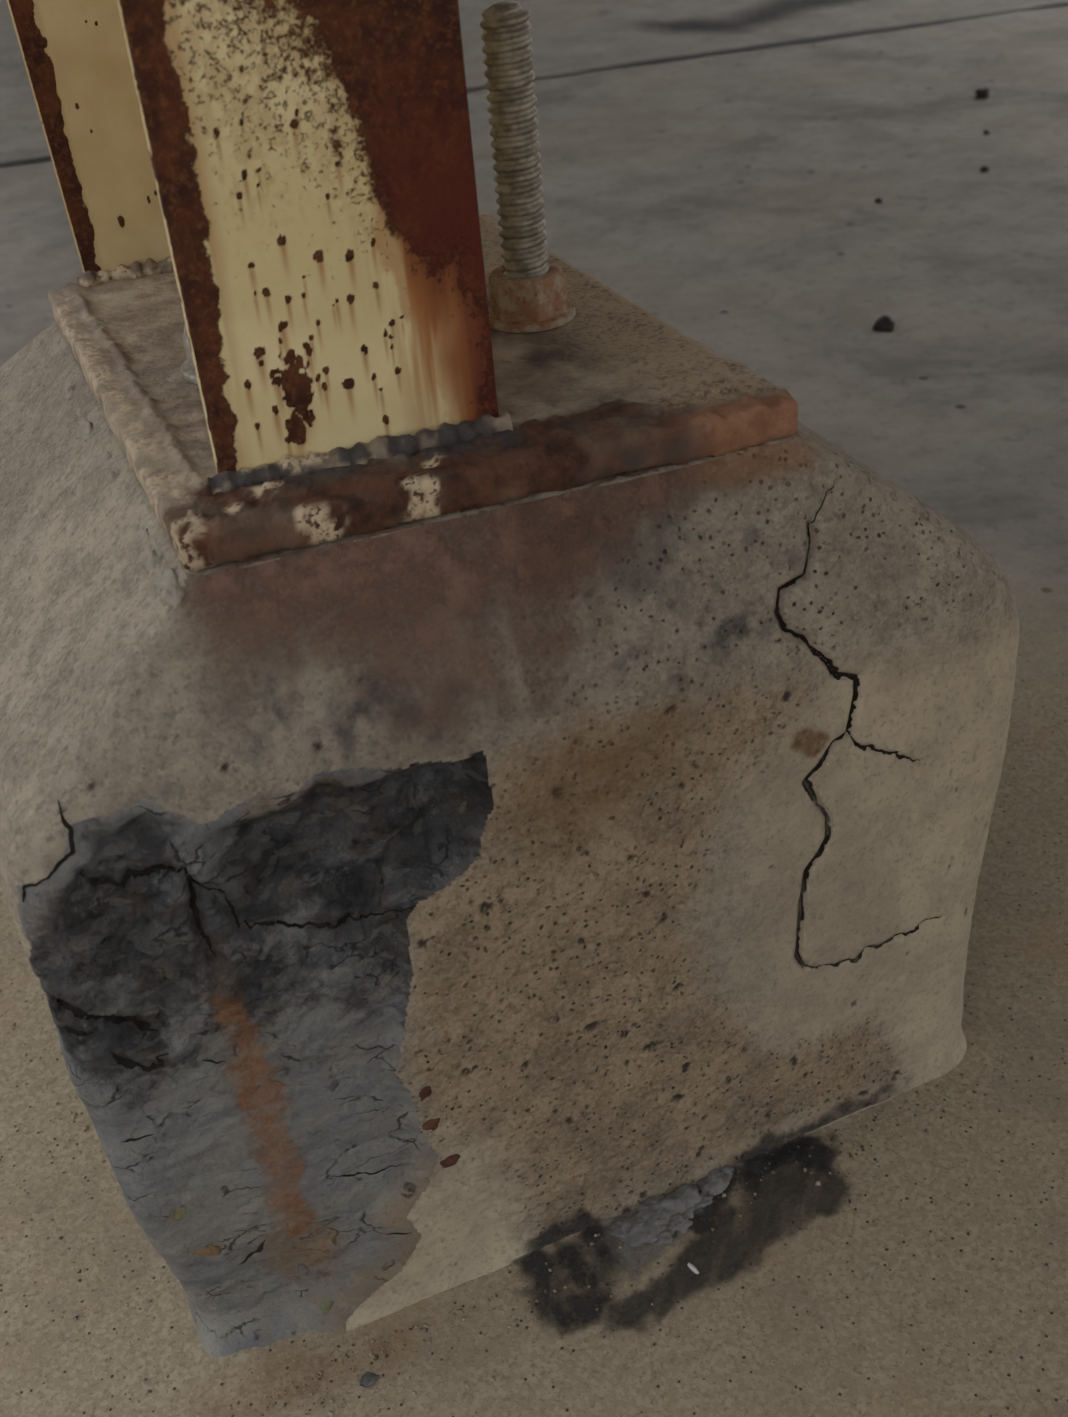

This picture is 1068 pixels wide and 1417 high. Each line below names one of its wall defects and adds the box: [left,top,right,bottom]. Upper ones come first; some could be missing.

crack [22,800,415,957]
spalling [16,750,494,1357]
water stain [529,1086,890,1328]
crack [775,479,941,969]